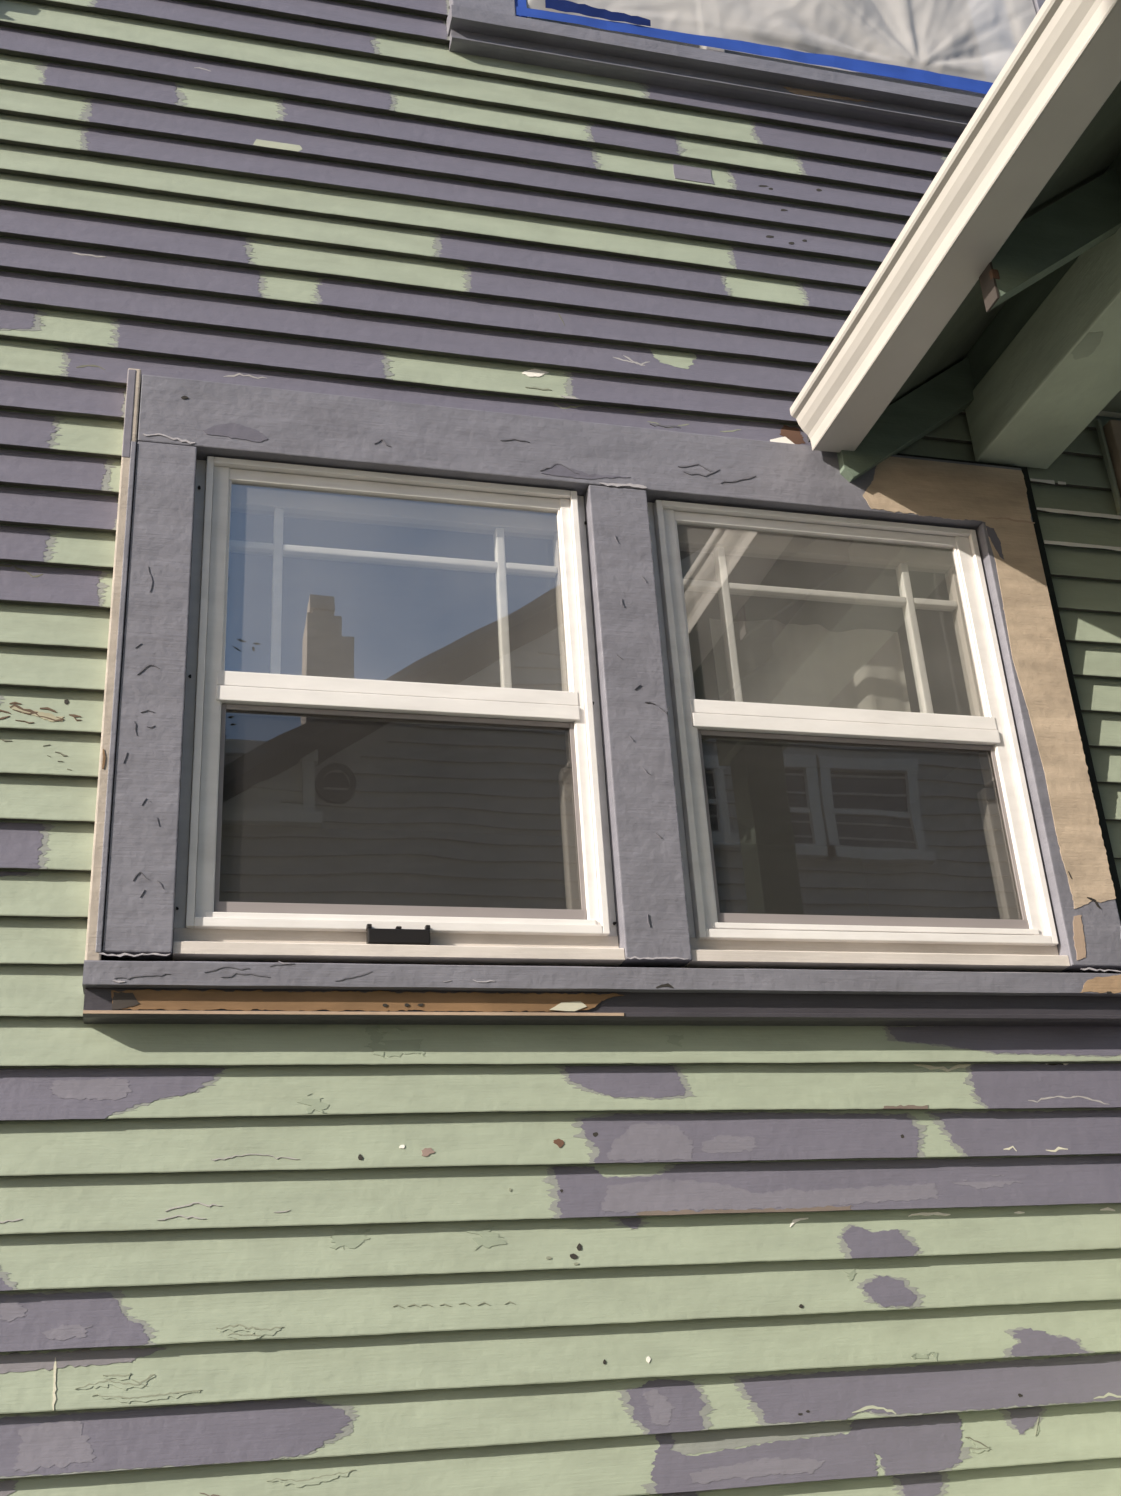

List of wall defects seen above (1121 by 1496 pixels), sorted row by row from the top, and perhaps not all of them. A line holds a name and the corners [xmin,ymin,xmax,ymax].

peeling [111,980,624,1012]
peeling [1028,1096,1106,1104]
peeling [852,1405,896,1414]